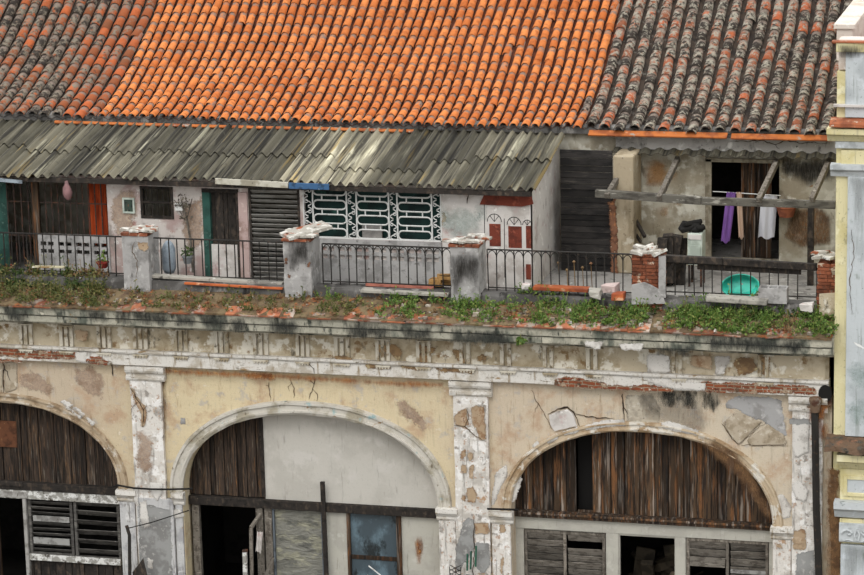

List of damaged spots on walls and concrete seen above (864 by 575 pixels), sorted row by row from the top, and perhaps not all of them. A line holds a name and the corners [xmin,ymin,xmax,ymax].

water stain [117,312,164,325]
water stain [177,316,245,332]
water stain [270,319,295,335]
water stain [348,325,388,338]
water stain [451,330,509,345]
flaking render [0,329,108,396]
crack [266,364,318,399]
peeling [131,388,152,471]
crack [531,390,628,427]
flaking render [532,376,699,448]
flaking render [724,411,811,458]
flaking render [776,529,815,575]